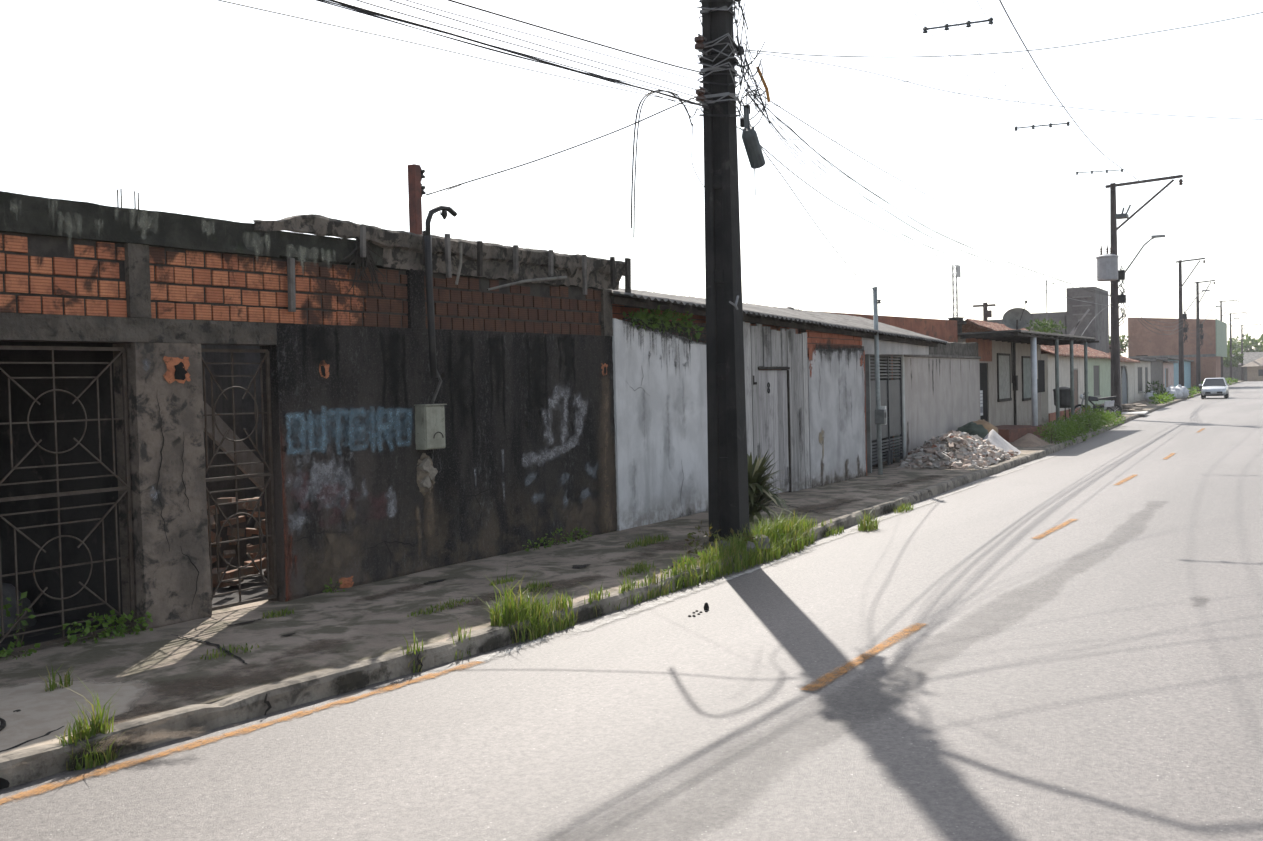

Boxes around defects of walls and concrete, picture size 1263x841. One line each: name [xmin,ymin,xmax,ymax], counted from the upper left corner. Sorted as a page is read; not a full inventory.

spalling [163,356,191,384]
spalling [319,361,330,378]